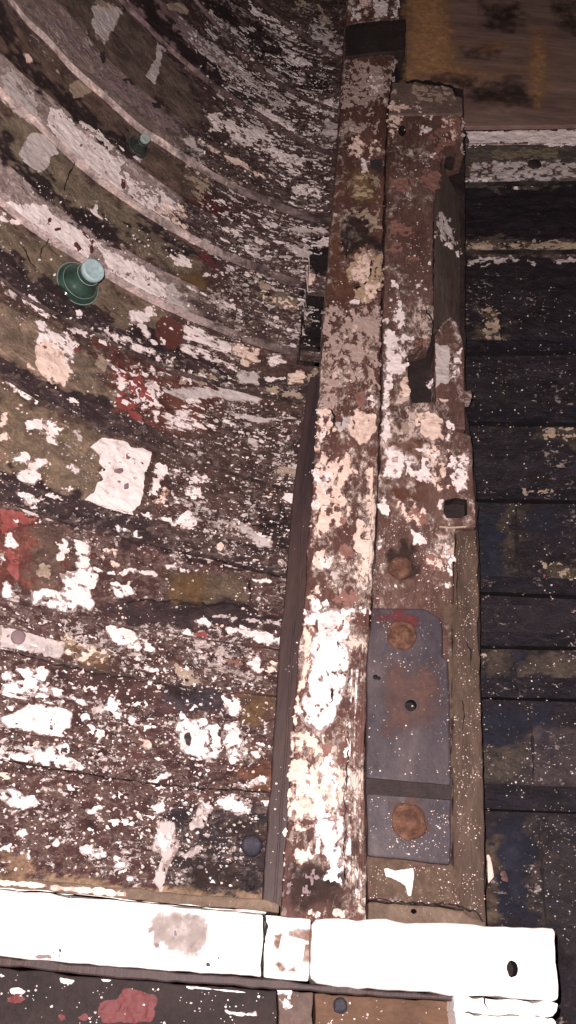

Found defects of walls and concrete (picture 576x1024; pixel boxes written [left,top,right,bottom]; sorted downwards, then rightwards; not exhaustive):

peeling [91,0,123,64]
peeling [146,42,167,84]
peeling [0,68,188,230]
peeling [166,0,576,253]
peeling [0,162,471,897]
rust [388,539,420,578]
peeling [306,908,345,918]
crack [371,898,484,922]